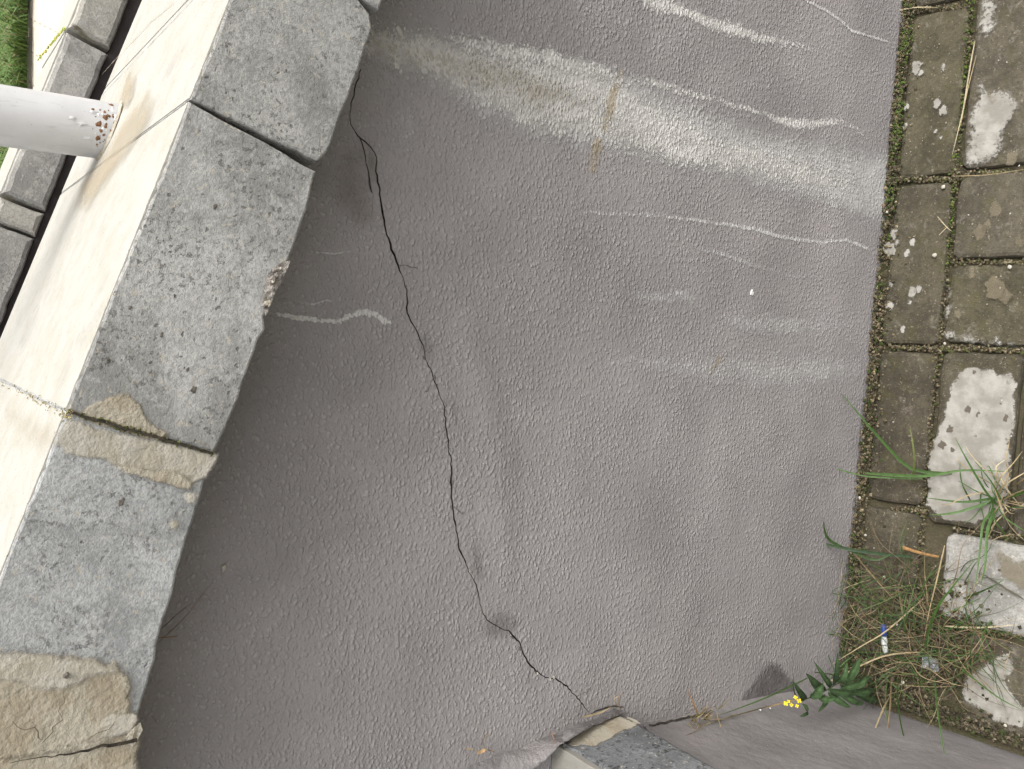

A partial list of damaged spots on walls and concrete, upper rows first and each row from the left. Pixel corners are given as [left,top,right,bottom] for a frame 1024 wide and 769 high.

efflorescence [639,0,811,51]
efflorescence [805,0,888,42]
rust [91,103,117,147]
efflorescence [365,23,890,222]
efflorescence [586,211,869,250]
spalling [261,261,290,316]
efflorescence [276,299,391,325]
crack [349,70,625,717]
water stain [744,666,793,700]
spalling [123,723,143,746]